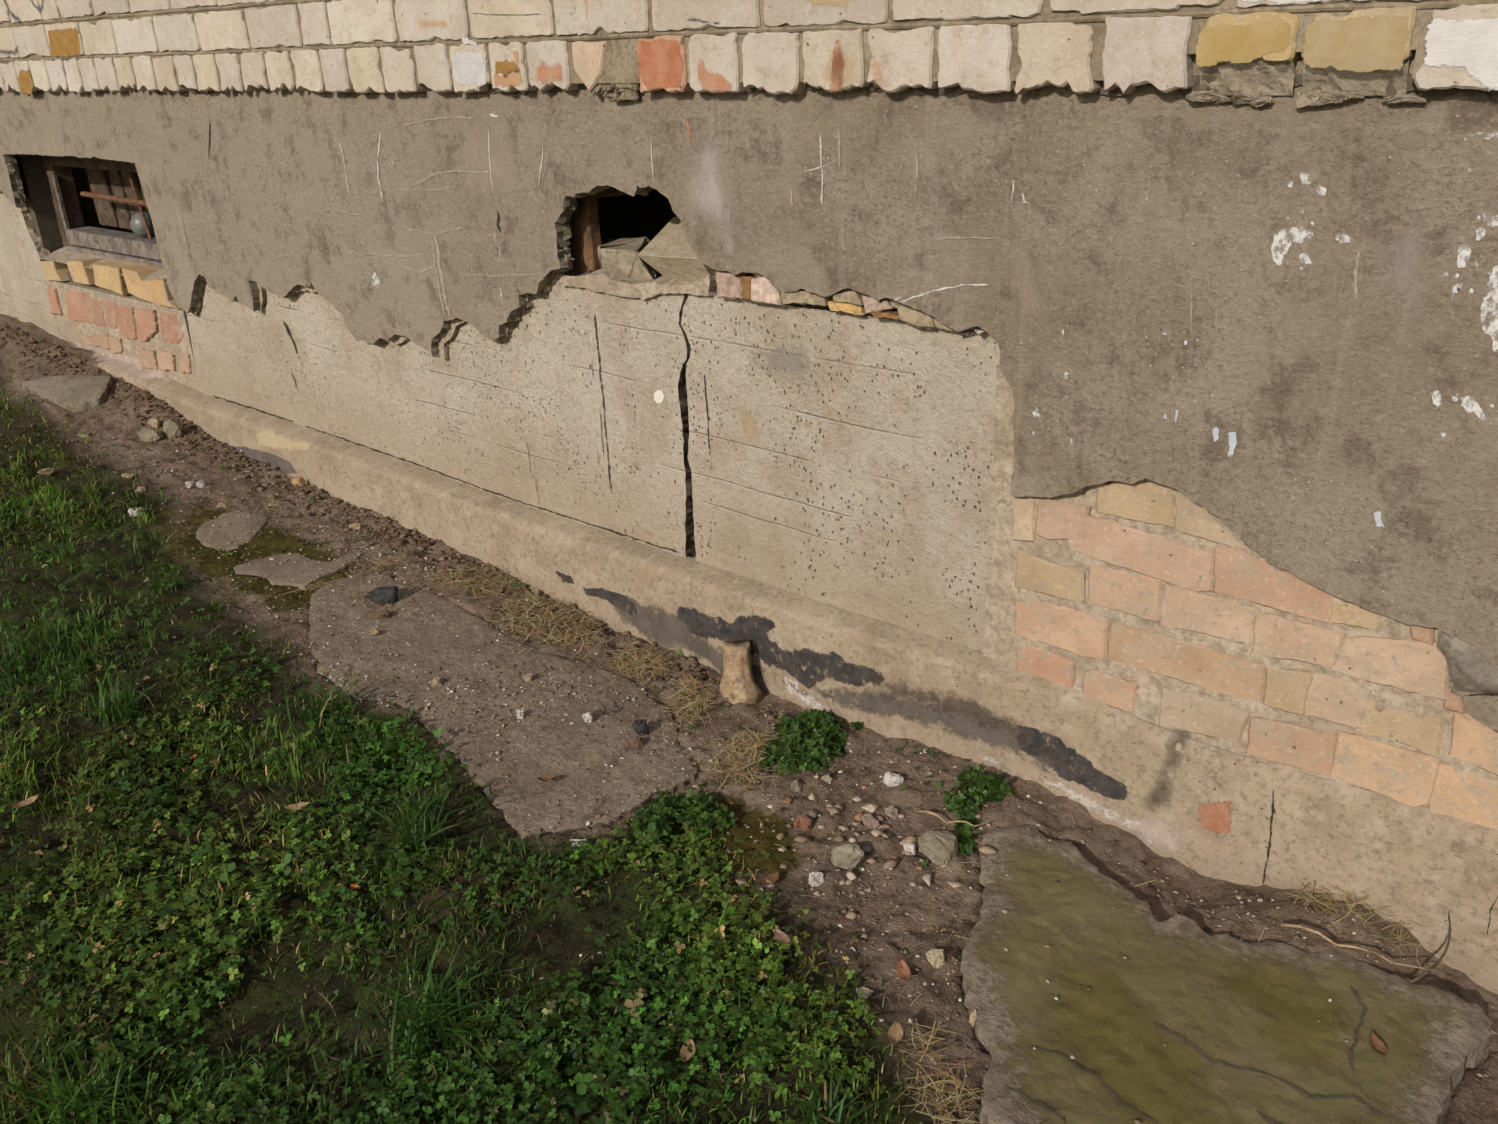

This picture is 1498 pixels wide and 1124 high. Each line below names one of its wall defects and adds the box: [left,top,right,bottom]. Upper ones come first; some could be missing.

spalling [805,83,883,94]
spalling [907,85,961,95]
spalling [1096,80,1152,97]
peeling [1176,18,1498,108]
crack [679,298,711,478]
peeling [187,186,1498,830]
crack [1262,789,1276,886]